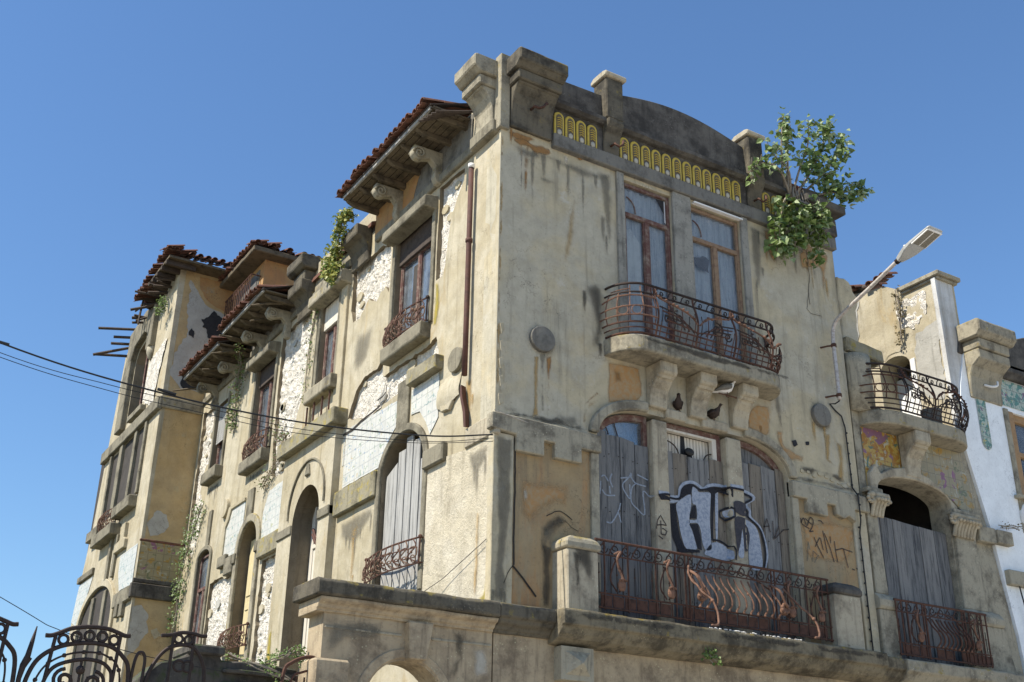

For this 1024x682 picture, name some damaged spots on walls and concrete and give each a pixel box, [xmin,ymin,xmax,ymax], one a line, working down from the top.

flaking render [440,173,465,277]
corrosion [510,129,550,188]
damp [558,158,610,244]
flaking render [356,246,392,320]
flaking render [142,280,226,405]
flaking render [275,314,312,477]
corrosion [533,354,551,415]
flaking render [856,290,946,402]
peeling [804,523,853,562]
flaking render [206,575,232,660]